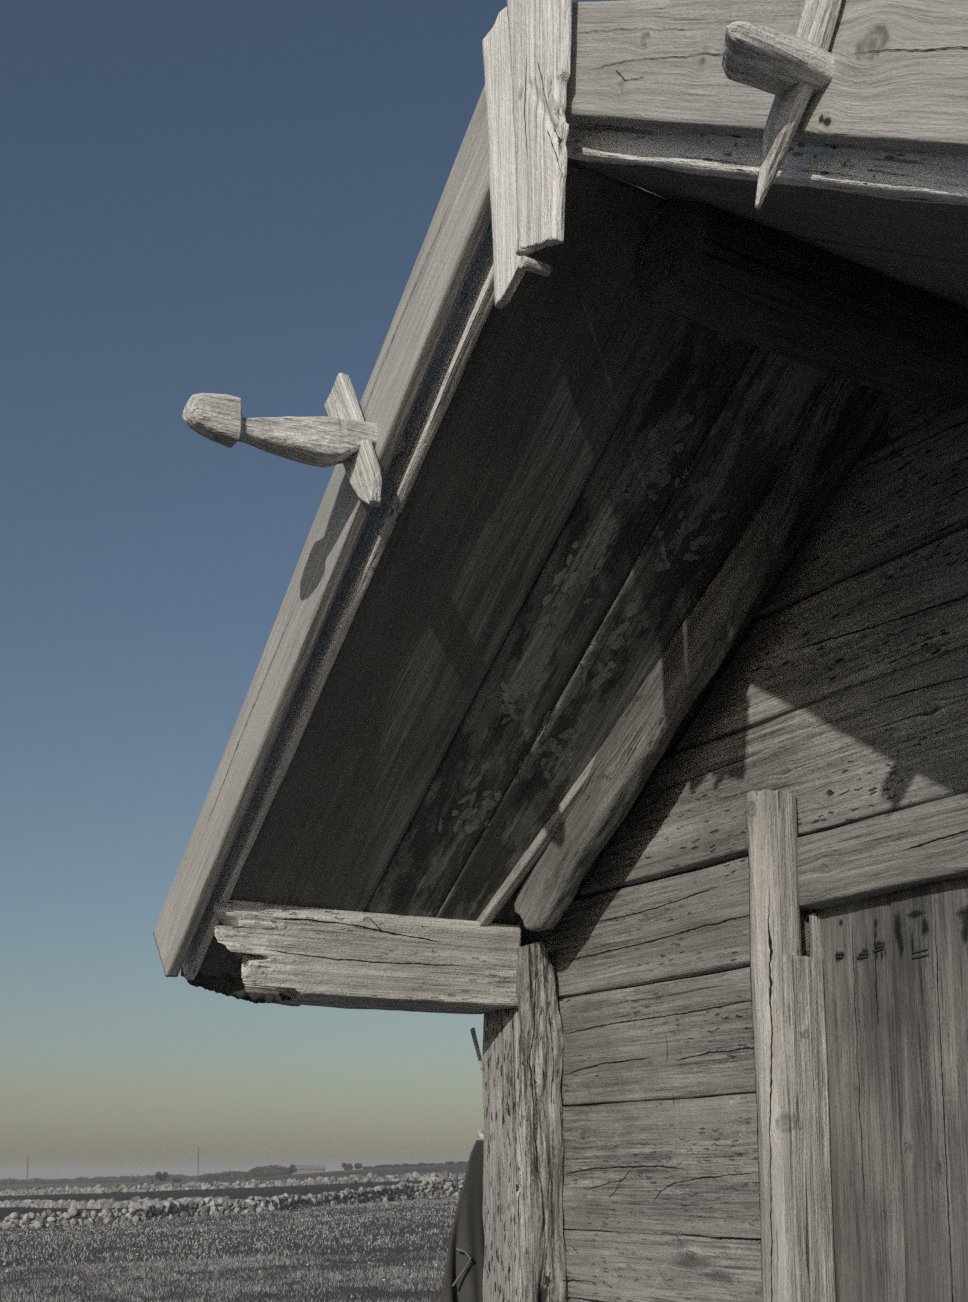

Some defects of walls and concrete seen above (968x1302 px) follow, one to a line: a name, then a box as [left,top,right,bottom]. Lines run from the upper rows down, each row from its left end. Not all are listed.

crack [853,46,968,54]
crack [271,918,460,966]